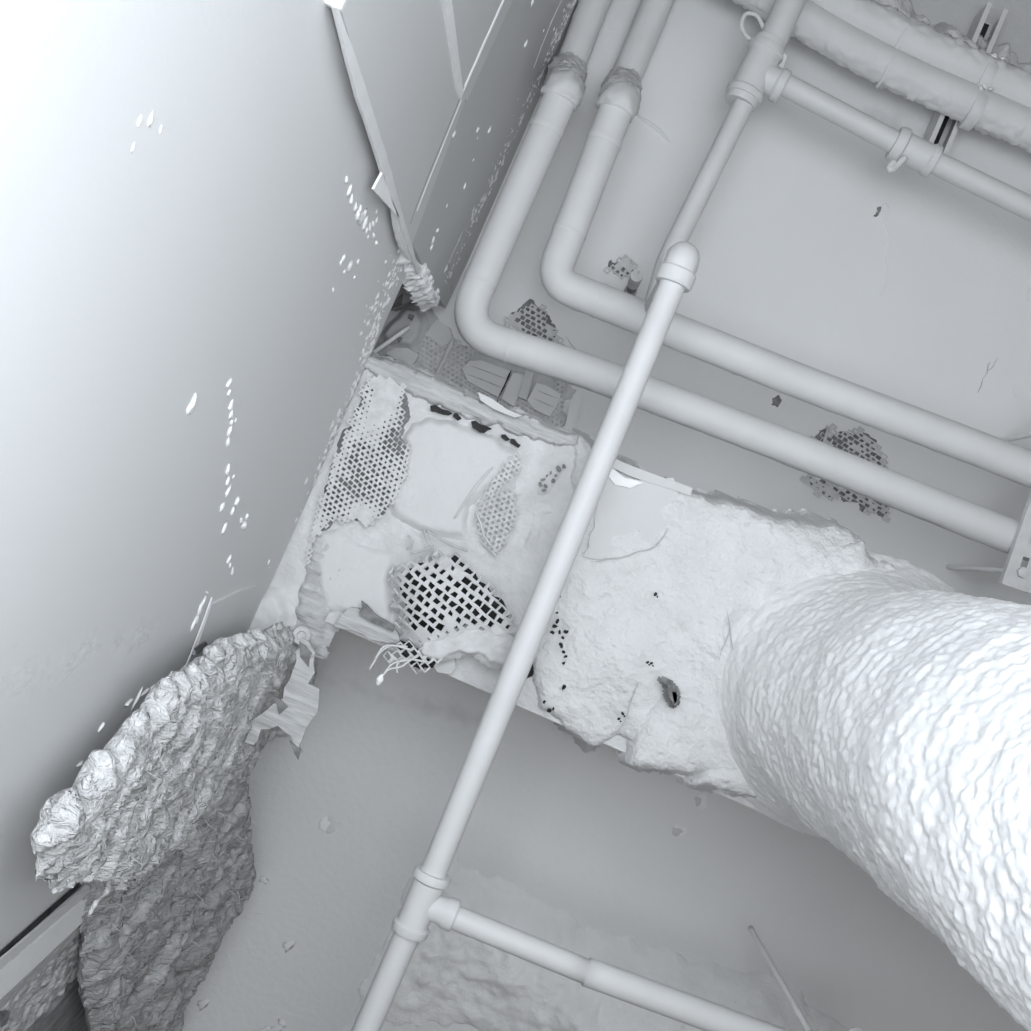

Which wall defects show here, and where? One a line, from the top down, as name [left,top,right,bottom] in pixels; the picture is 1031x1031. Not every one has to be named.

spalling [503,299,565,346]
flaking render [478,392,522,418]
spalling [810,423,889,468]
flaking render [295,374,413,660]
flaking render [454,453,524,557]
flaking render [537,464,566,495]
spalling [800,474,891,523]